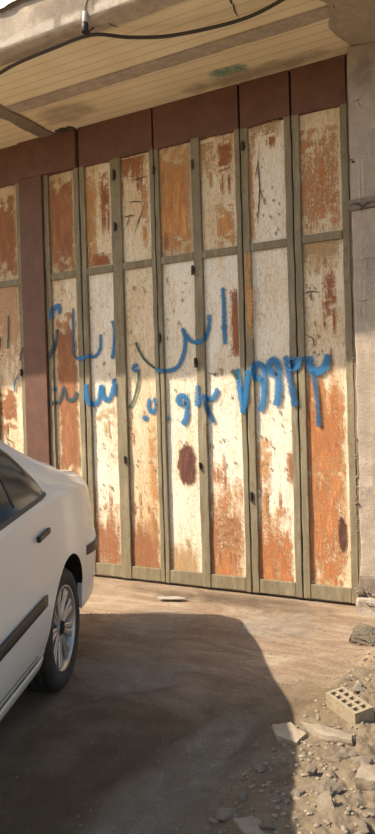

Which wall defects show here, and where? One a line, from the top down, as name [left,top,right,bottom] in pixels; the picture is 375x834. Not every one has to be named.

rust [85,168,110,267]
rust [159,146,191,257]
rust [200,132,235,246]
rust [300,126,340,332]
rust [0,194,21,435]
rust [56,312,80,475]
rust [94,482,121,564]
rust [131,419,160,568]
rust [177,444,197,486]
rust [210,452,244,577]
rust [257,436,293,582]
rust [306,348,347,587]